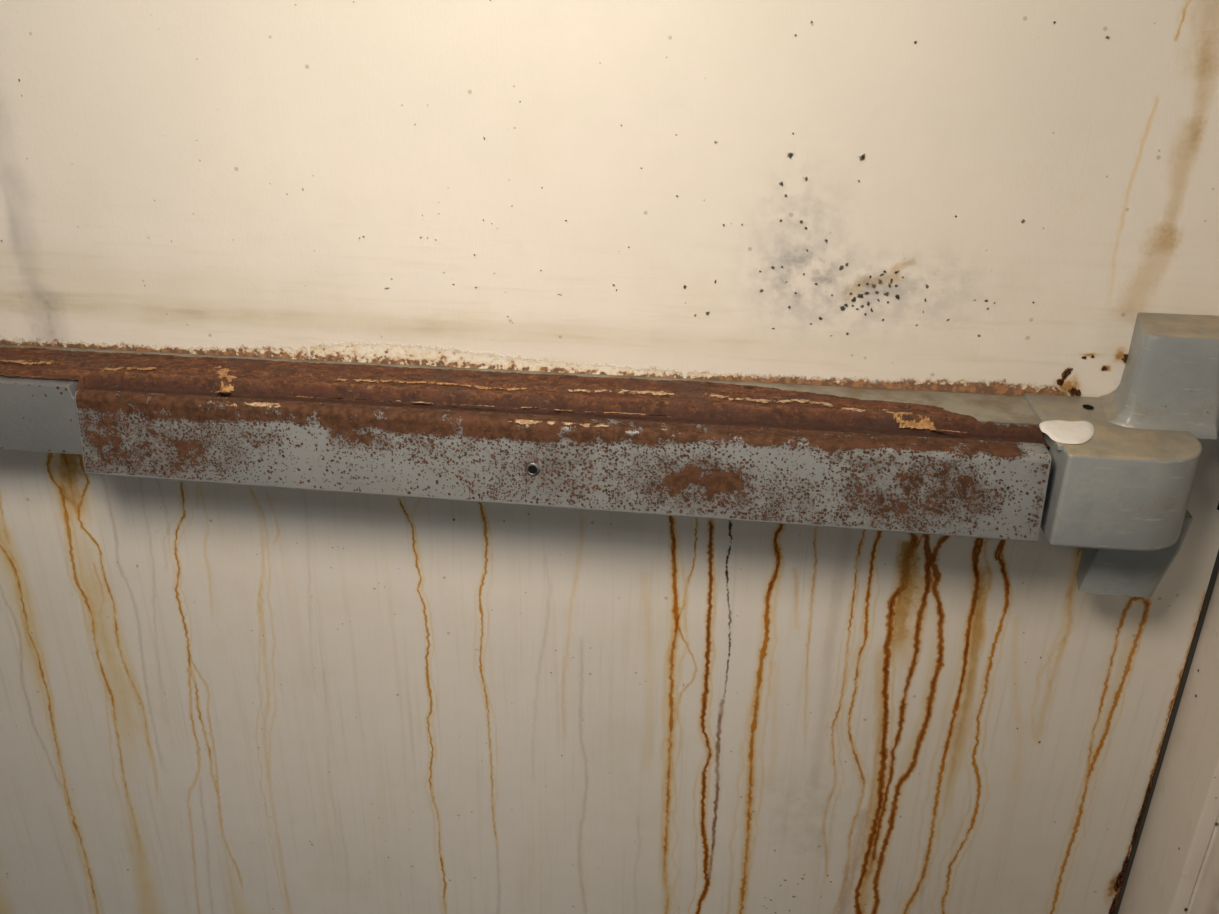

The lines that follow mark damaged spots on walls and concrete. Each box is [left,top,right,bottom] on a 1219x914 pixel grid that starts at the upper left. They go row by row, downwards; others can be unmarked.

corrosion [0,347,1050,914]
corrosion [1051,597,1156,914]